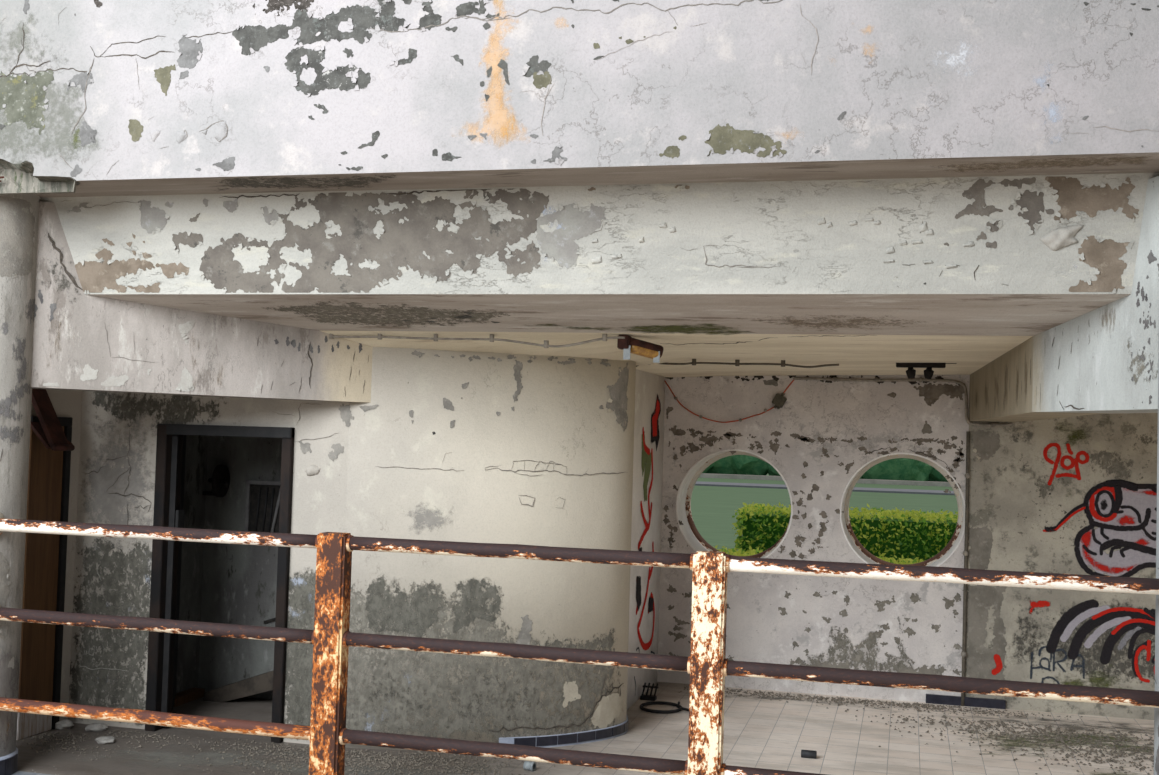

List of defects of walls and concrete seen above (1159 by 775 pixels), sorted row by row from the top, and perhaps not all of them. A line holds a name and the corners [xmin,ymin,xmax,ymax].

crack [0,18,234,169]
peeling [232,0,499,120]
rust [469,0,524,138]
crack [48,233,82,290]
peeling [75,187,622,294]
peeling [955,176,1139,248]
peeling [1069,234,1159,379]
peeling [666,406,1000,493]
damp [69,391,224,725]
damp [284,570,316,740]
damp [346,576,621,741]
peeling [897,584,1007,680]